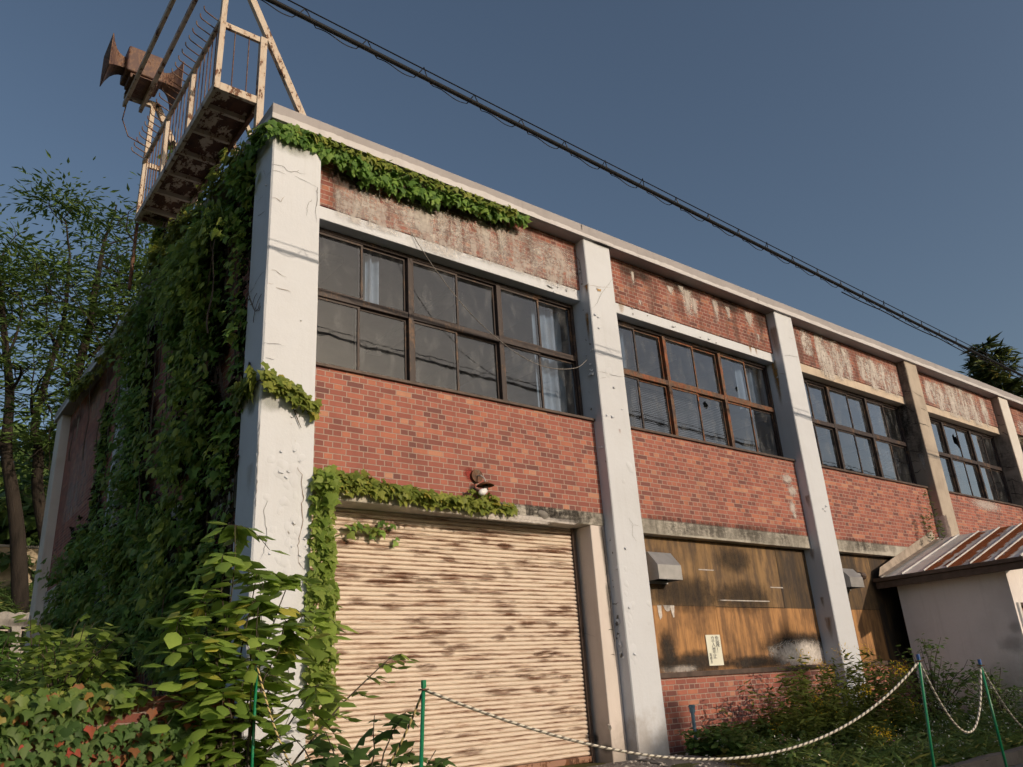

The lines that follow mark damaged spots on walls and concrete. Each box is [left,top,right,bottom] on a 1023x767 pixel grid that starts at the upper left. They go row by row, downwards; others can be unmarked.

damp [331,171,533,272]
damp [801,330,908,394]
damp [925,381,989,426]
corrosion [925,524,1023,571]